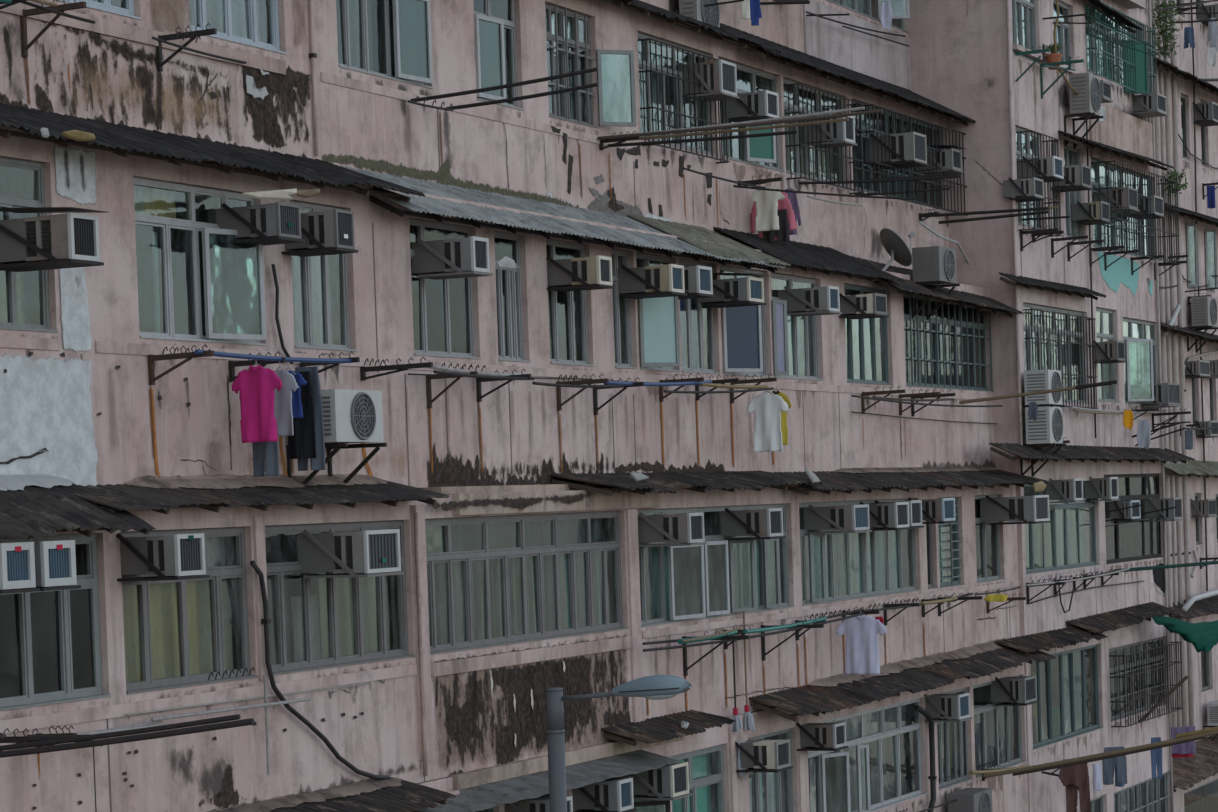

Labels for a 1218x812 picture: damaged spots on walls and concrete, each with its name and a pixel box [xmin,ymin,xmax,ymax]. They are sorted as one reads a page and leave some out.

water stain [0,22,312,157]
peeling [246,69,269,100]
water stain [64,150,84,187]
peeling [0,267,102,486]
water stain [426,443,725,511]
water stain [433,636,631,775]
water stain [172,749,248,809]